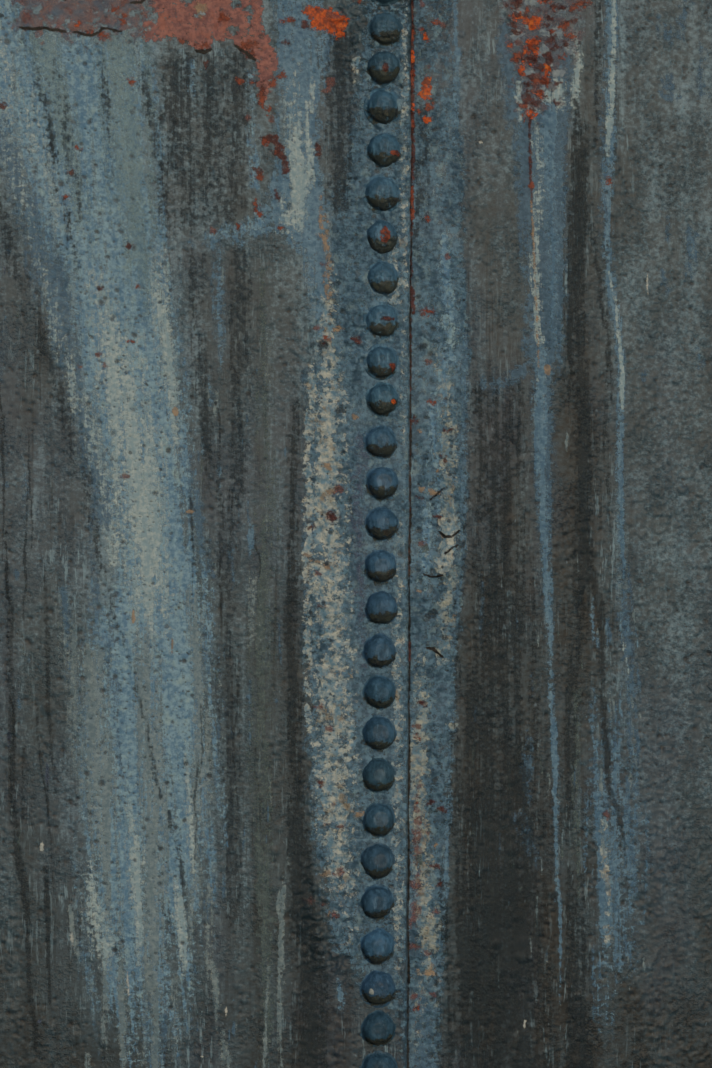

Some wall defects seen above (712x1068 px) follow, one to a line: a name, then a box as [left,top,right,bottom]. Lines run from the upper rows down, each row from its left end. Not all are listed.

rust [7,0,155,44]
rust [279,5,350,39]
rust [390,0,445,241]
rust [498,0,593,268]
rust [410,257,435,320]